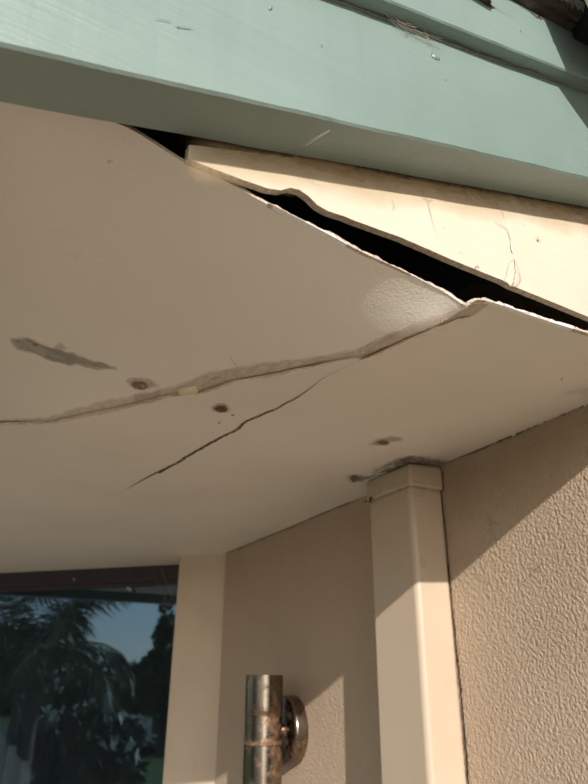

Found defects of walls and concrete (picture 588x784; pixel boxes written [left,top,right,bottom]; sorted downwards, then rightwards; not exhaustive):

crack [496,195,516,287]
crack [50,392,178,422]
crack [120,316,470,493]